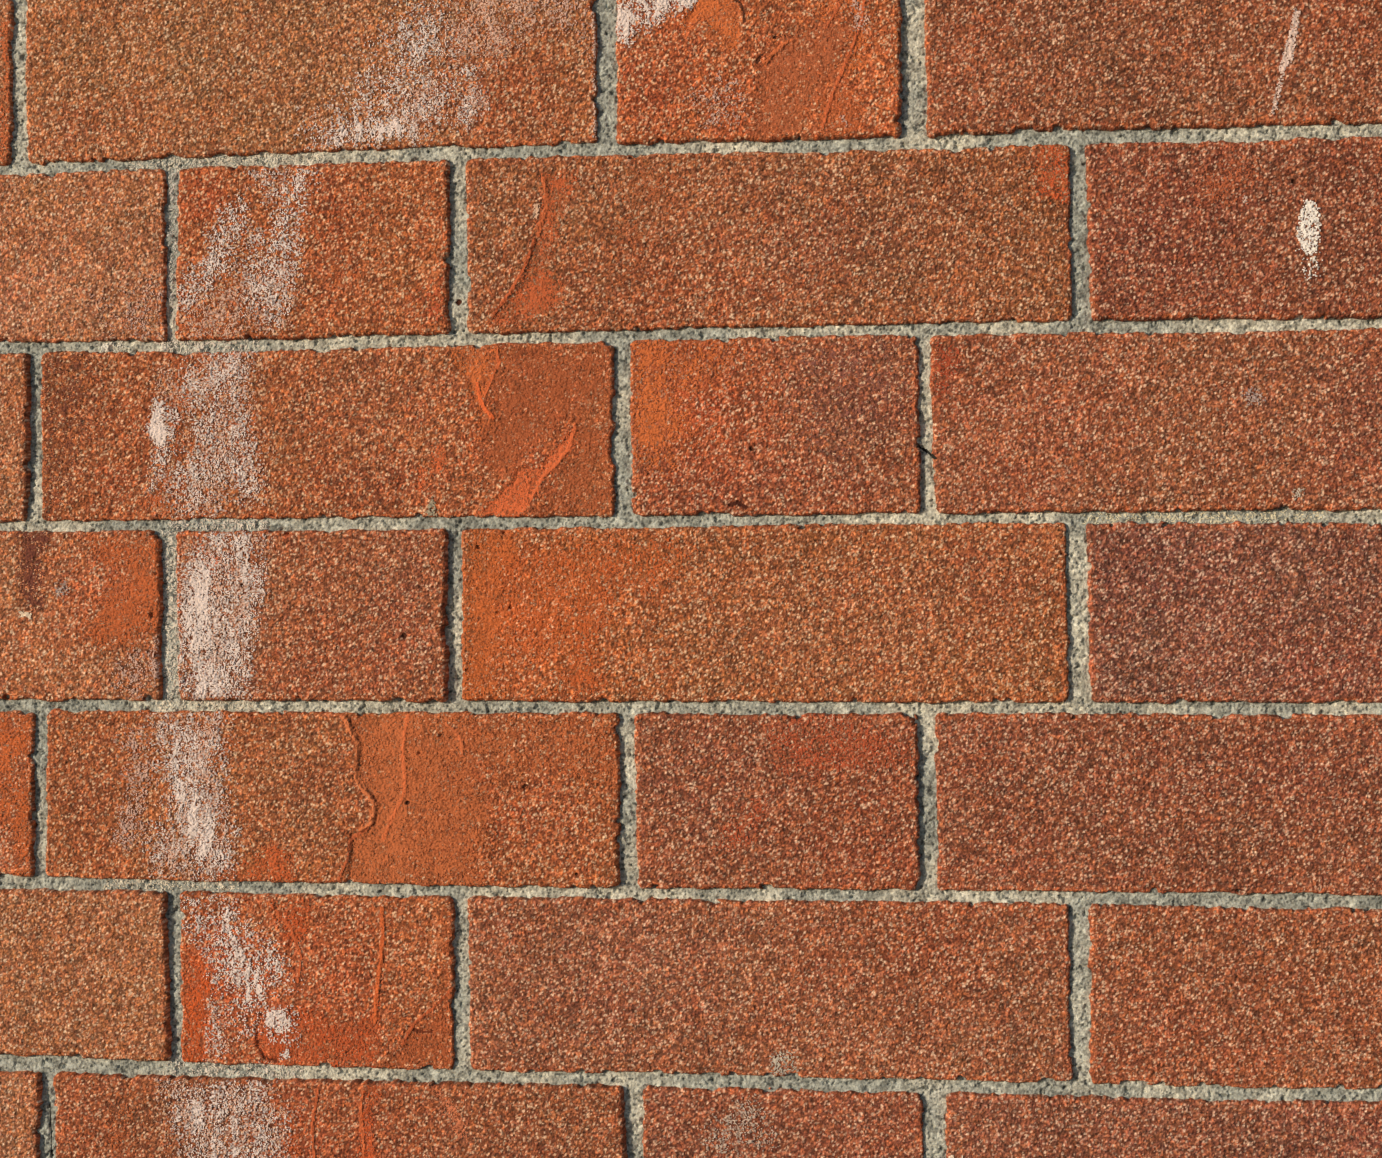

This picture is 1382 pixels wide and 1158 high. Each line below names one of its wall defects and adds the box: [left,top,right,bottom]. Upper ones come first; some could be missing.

efflorescence [532,0,597,140]
efflorescence [616,0,698,48]
damp [14,0,490,1158]